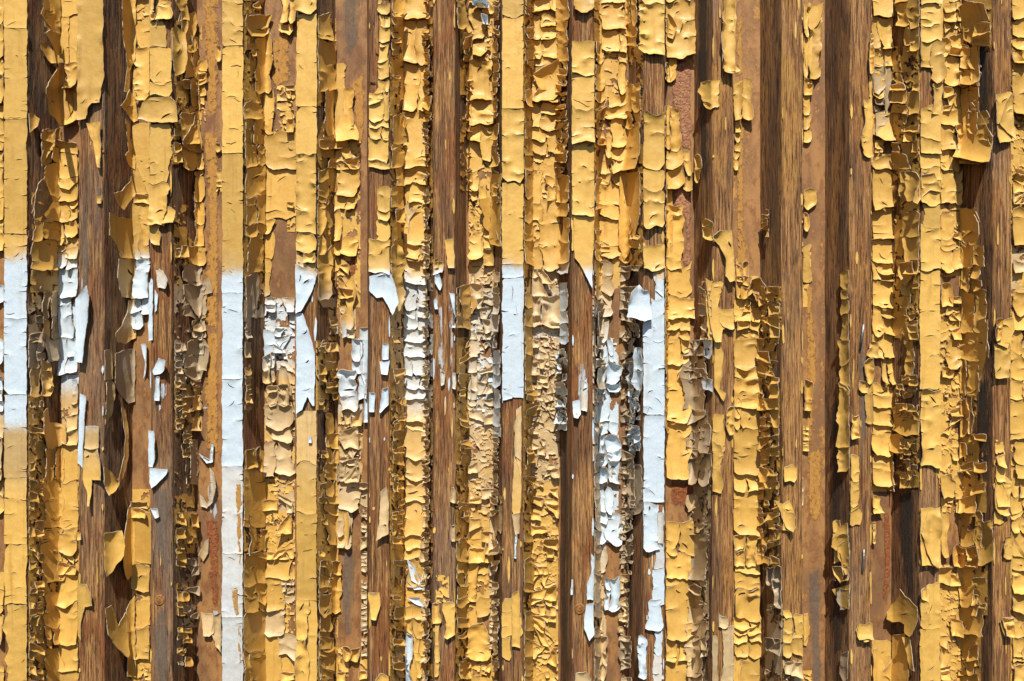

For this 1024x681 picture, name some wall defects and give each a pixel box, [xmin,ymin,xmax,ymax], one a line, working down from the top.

corrosion [672,62,692,148]
peeling [794,0,823,143]
corrosion [674,186,691,265]
peeling [800,188,817,307]
peeling [0,0,814,681]
peeling [832,0,1024,681]